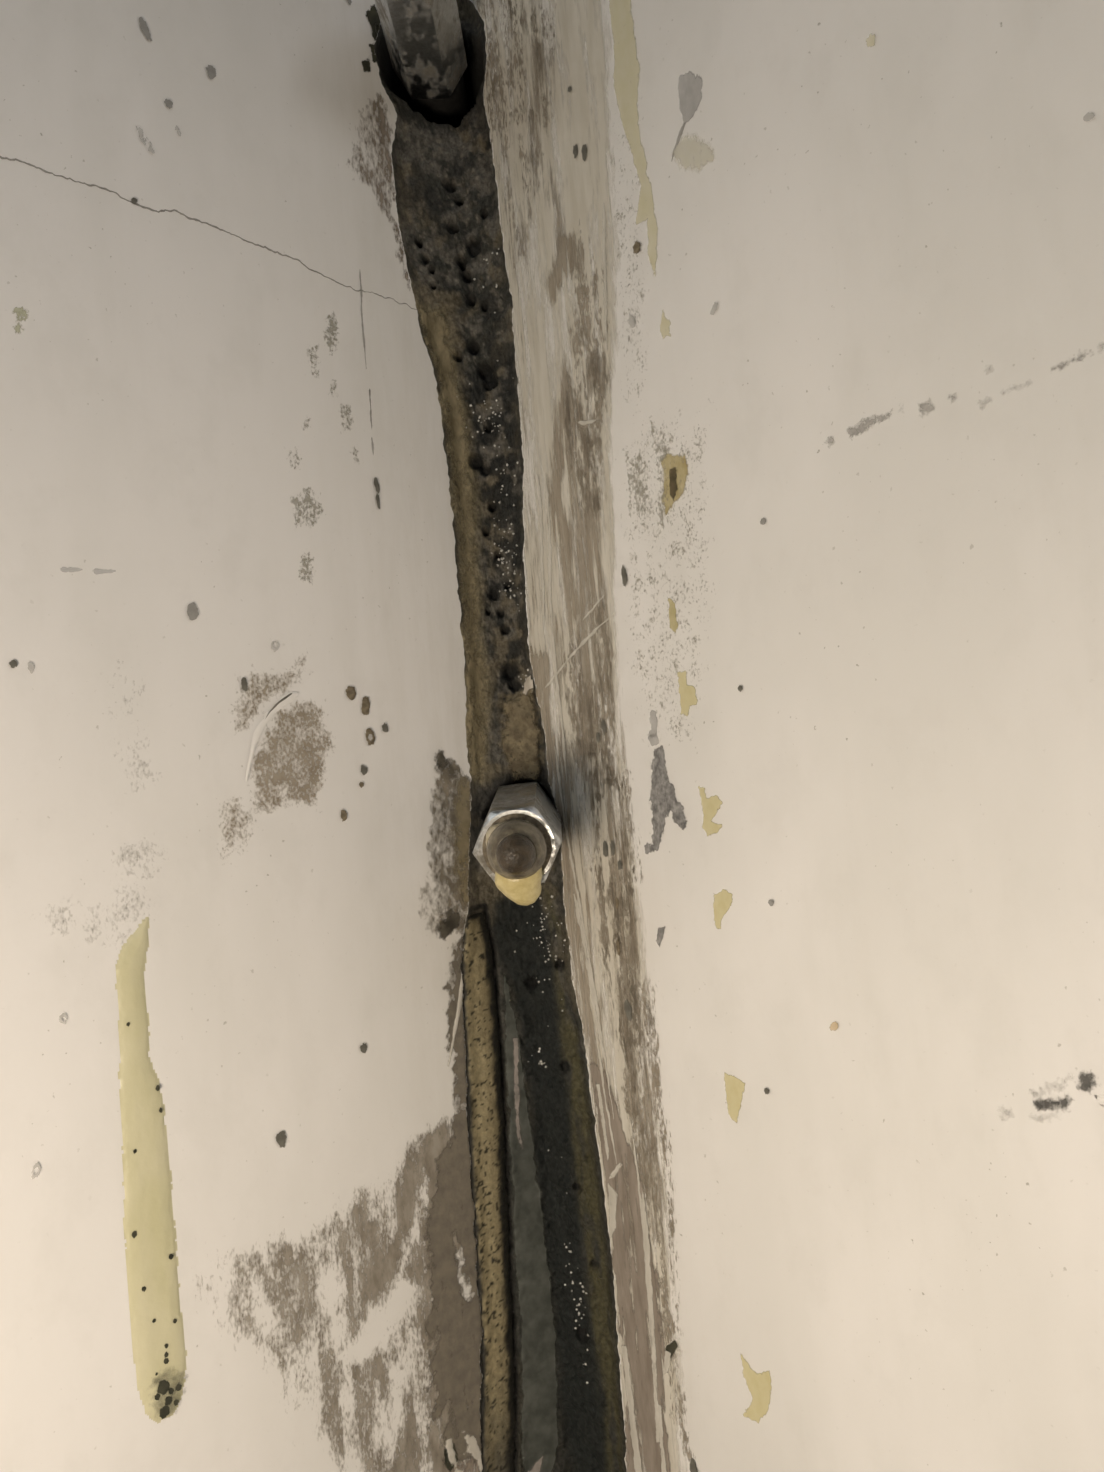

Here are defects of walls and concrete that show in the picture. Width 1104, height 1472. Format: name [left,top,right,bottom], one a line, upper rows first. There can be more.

peeling [671,72,702,161]
crack [0,0,627,1472]
peeling [644,710,687,854]